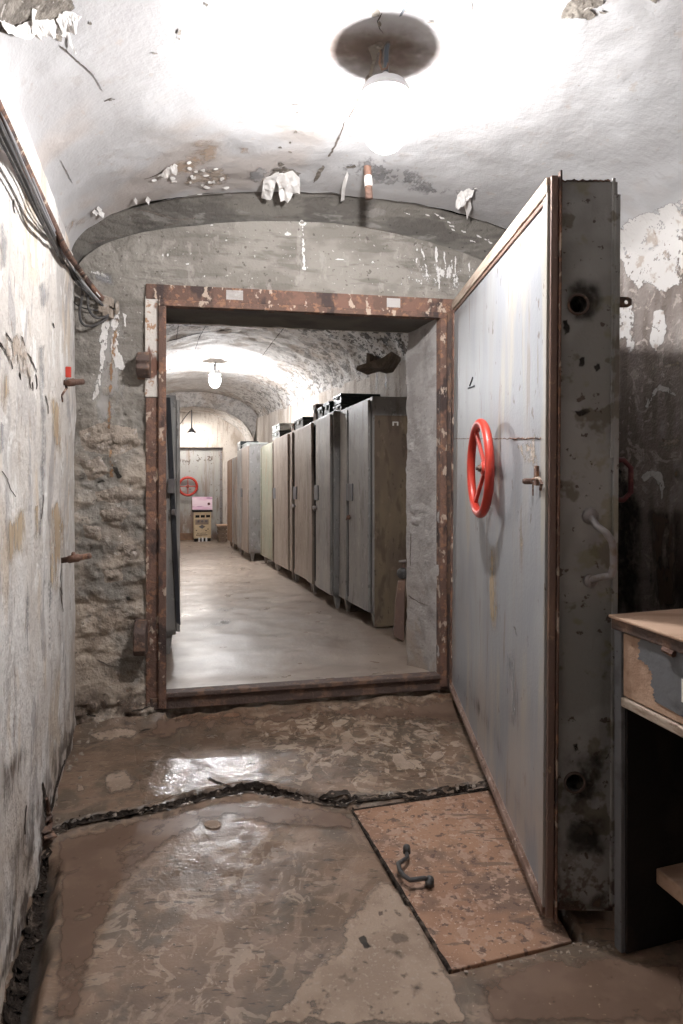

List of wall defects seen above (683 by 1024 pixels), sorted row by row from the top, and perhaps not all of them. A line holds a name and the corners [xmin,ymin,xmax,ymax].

flaking render [0,0,92,74]
flaking render [561,0,606,20]
flaking render [146,161,229,195]
damp [299,220,308,270]
peeling [620,199,683,292]
peeling [620,300,635,355]
peeling [650,310,667,351]
damp [618,469,678,608]
crack [25,760,489,834]